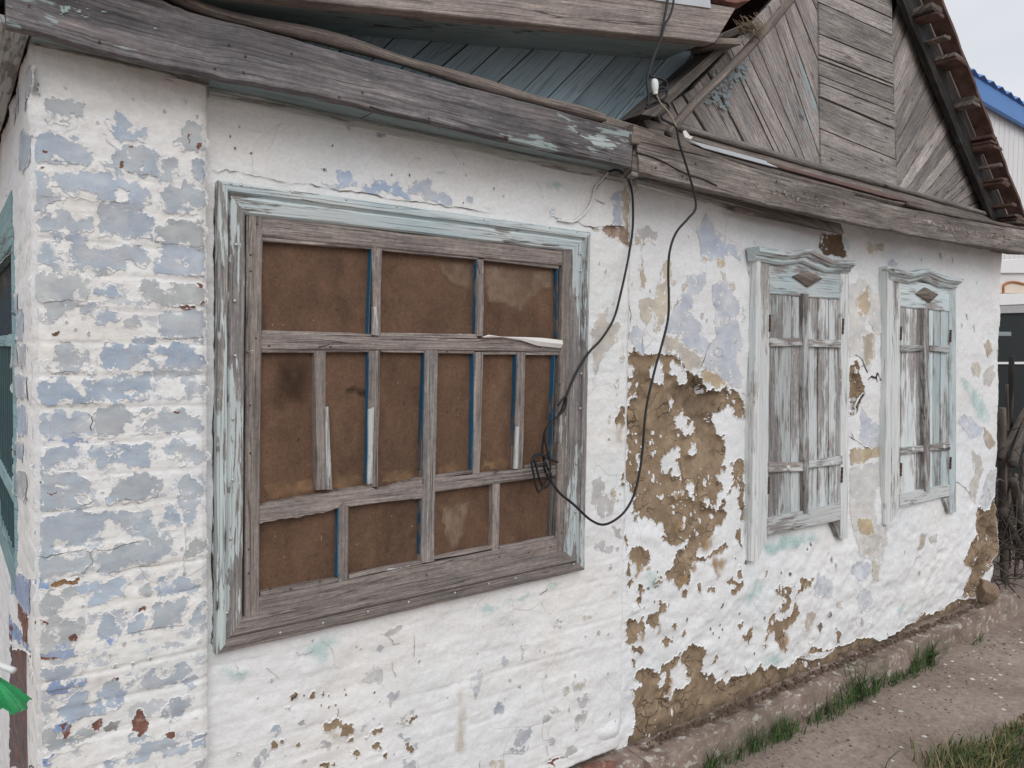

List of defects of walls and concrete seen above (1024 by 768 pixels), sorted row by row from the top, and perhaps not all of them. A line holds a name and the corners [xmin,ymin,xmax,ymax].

crack [159,152,487,371]
spalling [591,185,658,248]
peeling [8,65,211,768]
crack [181,406,214,645]
spalling [590,213,999,748]
spalling [251,689,419,768]
flaking render [489,672,591,768]